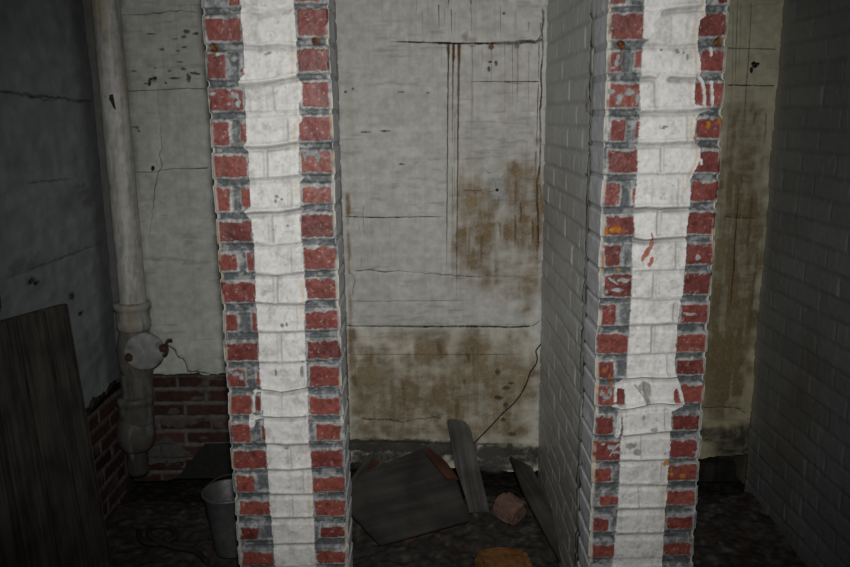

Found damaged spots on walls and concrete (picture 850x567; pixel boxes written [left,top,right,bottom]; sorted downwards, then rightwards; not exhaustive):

corrosion [447,44,460,224]
crack [403,11,544,243]
peeling [608,88,640,104]
damp [454,162,544,294]
peeling [604,277,629,294]
peeling [641,233,654,267]
flaking render [134,372,244,481]
damp [348,329,539,472]
peeling [601,443,641,456]
peeling [634,382,651,405]